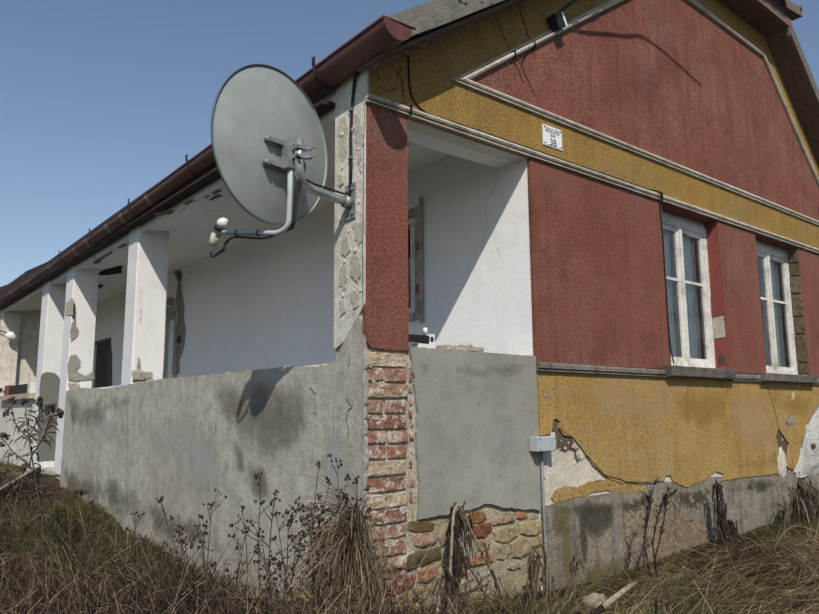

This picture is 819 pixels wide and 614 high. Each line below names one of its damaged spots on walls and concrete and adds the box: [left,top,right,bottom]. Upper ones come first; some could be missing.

crack [494,4,537,93]
crack [378,63,412,117]
flaking render [66,298,79,342]
flaking render [166,269,186,374]
flaking render [788,248,809,375]
flaking render [67,355,94,390]
flaking render [776,430,789,480]
peeling [539,420,723,568]
leakage [579,504,612,559]